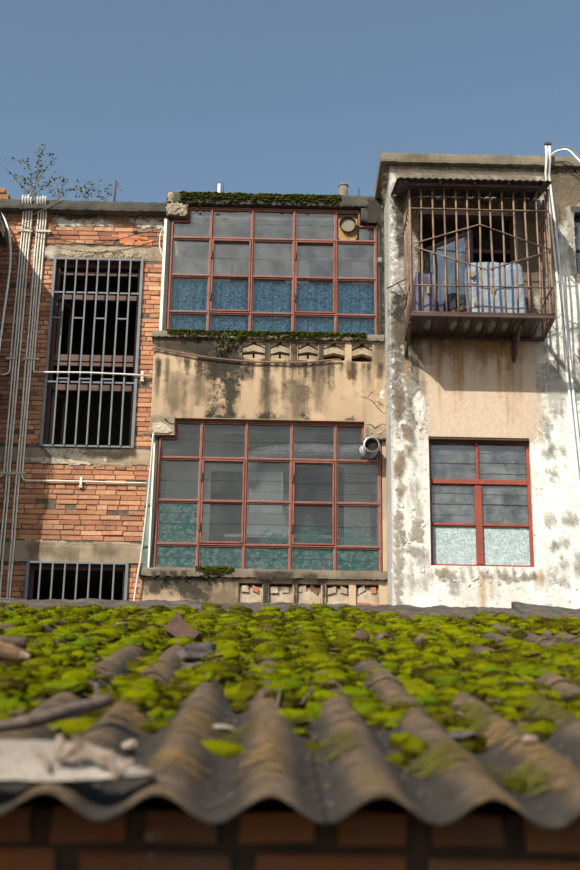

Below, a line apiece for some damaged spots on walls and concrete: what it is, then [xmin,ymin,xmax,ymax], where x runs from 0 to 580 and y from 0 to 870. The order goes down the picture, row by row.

water stain [367,165,580,386]
water stain [154,337,334,420]
water stain [537,349,580,412]
peeling [391,502,426,605]
peeling [420,566,538,586]